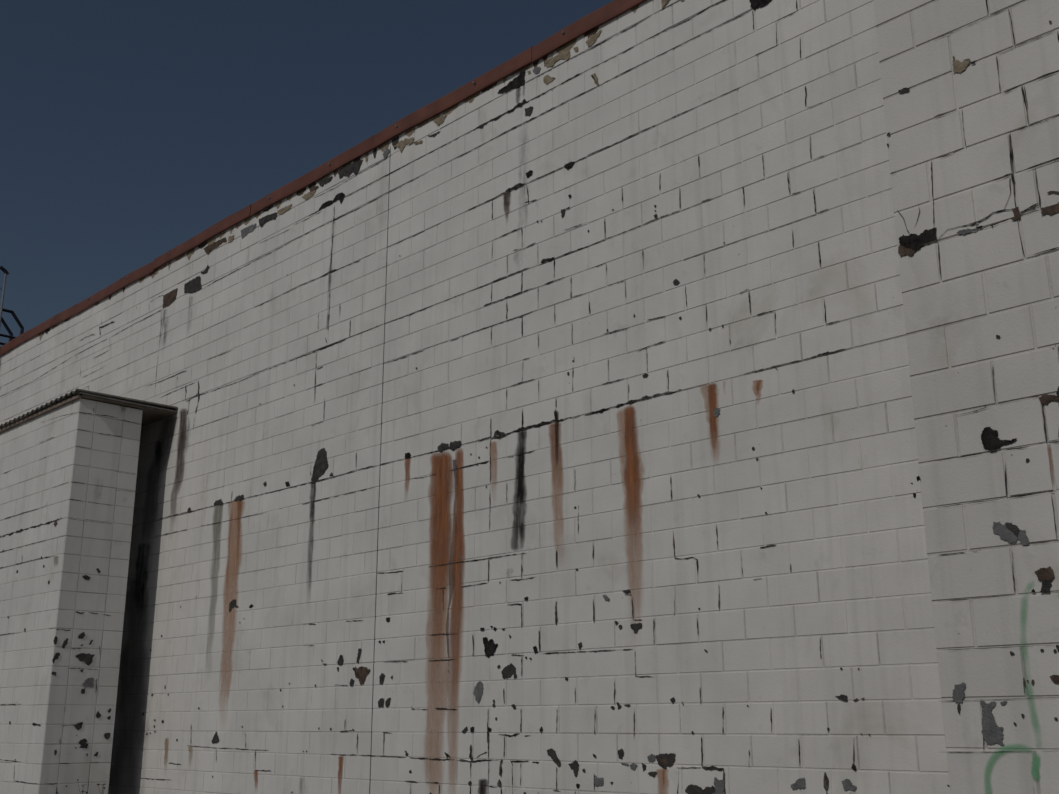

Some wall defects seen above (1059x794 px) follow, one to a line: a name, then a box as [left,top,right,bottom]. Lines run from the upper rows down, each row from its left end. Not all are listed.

peeling [139,27,602,308]
crack [762,154,827,213]
crack [897,0,1059,277]
damp [152,419,174,494]
damp [213,506,222,581]
rust [223,501,243,688]
rust [429,451,464,780]
peeling [480,626,517,679]
damp [513,431,526,549]
rust [620,407,642,576]
peeling [980,427,1017,451]
peeling [980,700,1024,746]